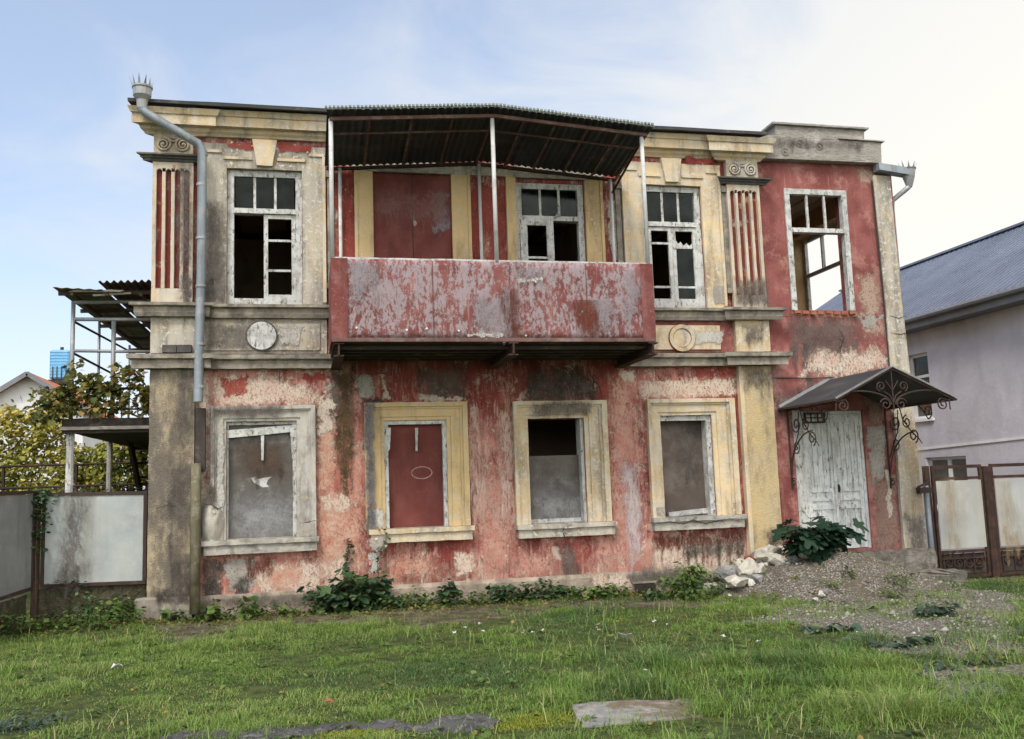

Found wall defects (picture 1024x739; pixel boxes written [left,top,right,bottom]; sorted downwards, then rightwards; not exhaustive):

damp [206,203,226,302]
peeling [467,262,543,338]
peeling [589,272,640,337]
damp [737,278,767,307]
peeling [792,271,888,380]
damp [525,365,597,417]
peeling [619,369,738,408]
peeling [197,371,338,529]
damp [329,369,384,531]
damp [155,464,190,603]
damp [613,413,744,589]